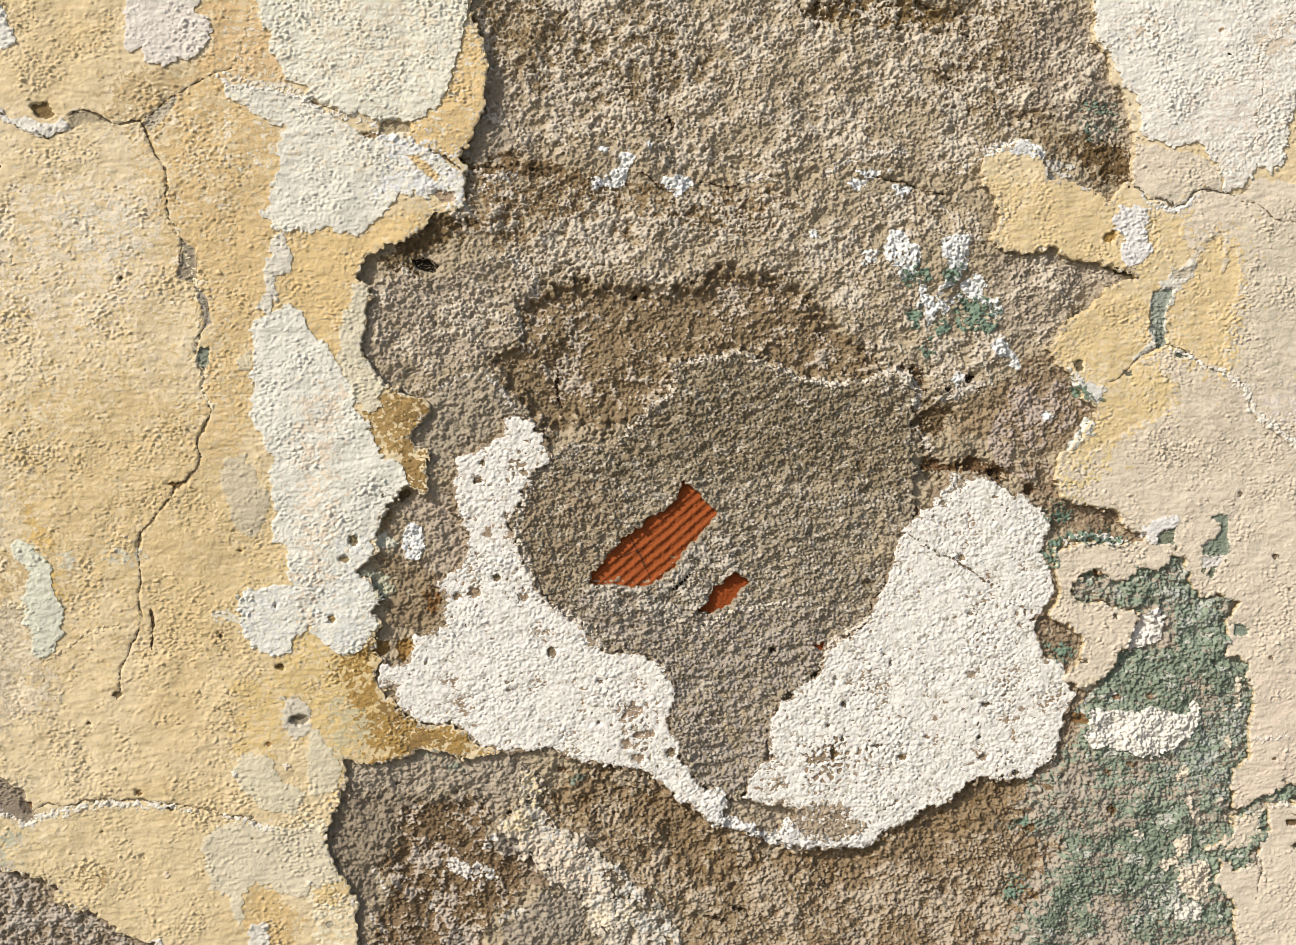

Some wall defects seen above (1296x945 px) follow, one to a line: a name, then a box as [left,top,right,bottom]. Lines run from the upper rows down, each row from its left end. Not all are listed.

crack [0,17,249,691]
spalling [325,0,1296,945]
spalling [0,870,155,945]
crack [38,798,258,824]